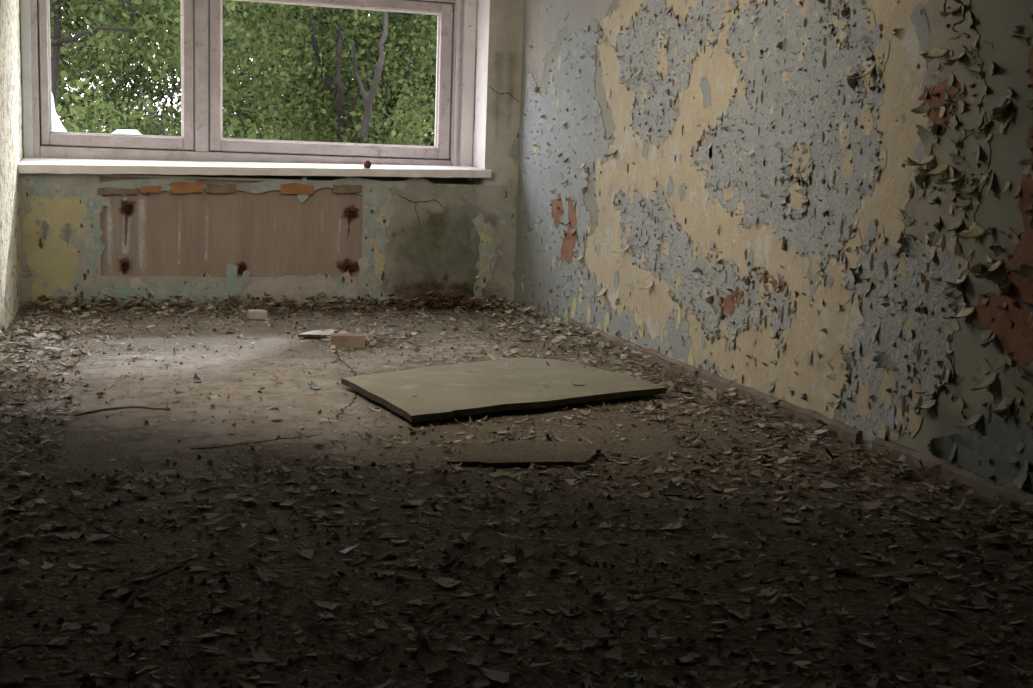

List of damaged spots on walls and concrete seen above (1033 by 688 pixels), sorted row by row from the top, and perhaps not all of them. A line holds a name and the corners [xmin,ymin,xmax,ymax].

corrosion [121,200,134,243]
corrosion [337,259,359,275]
peeling [20,0,1033,494]